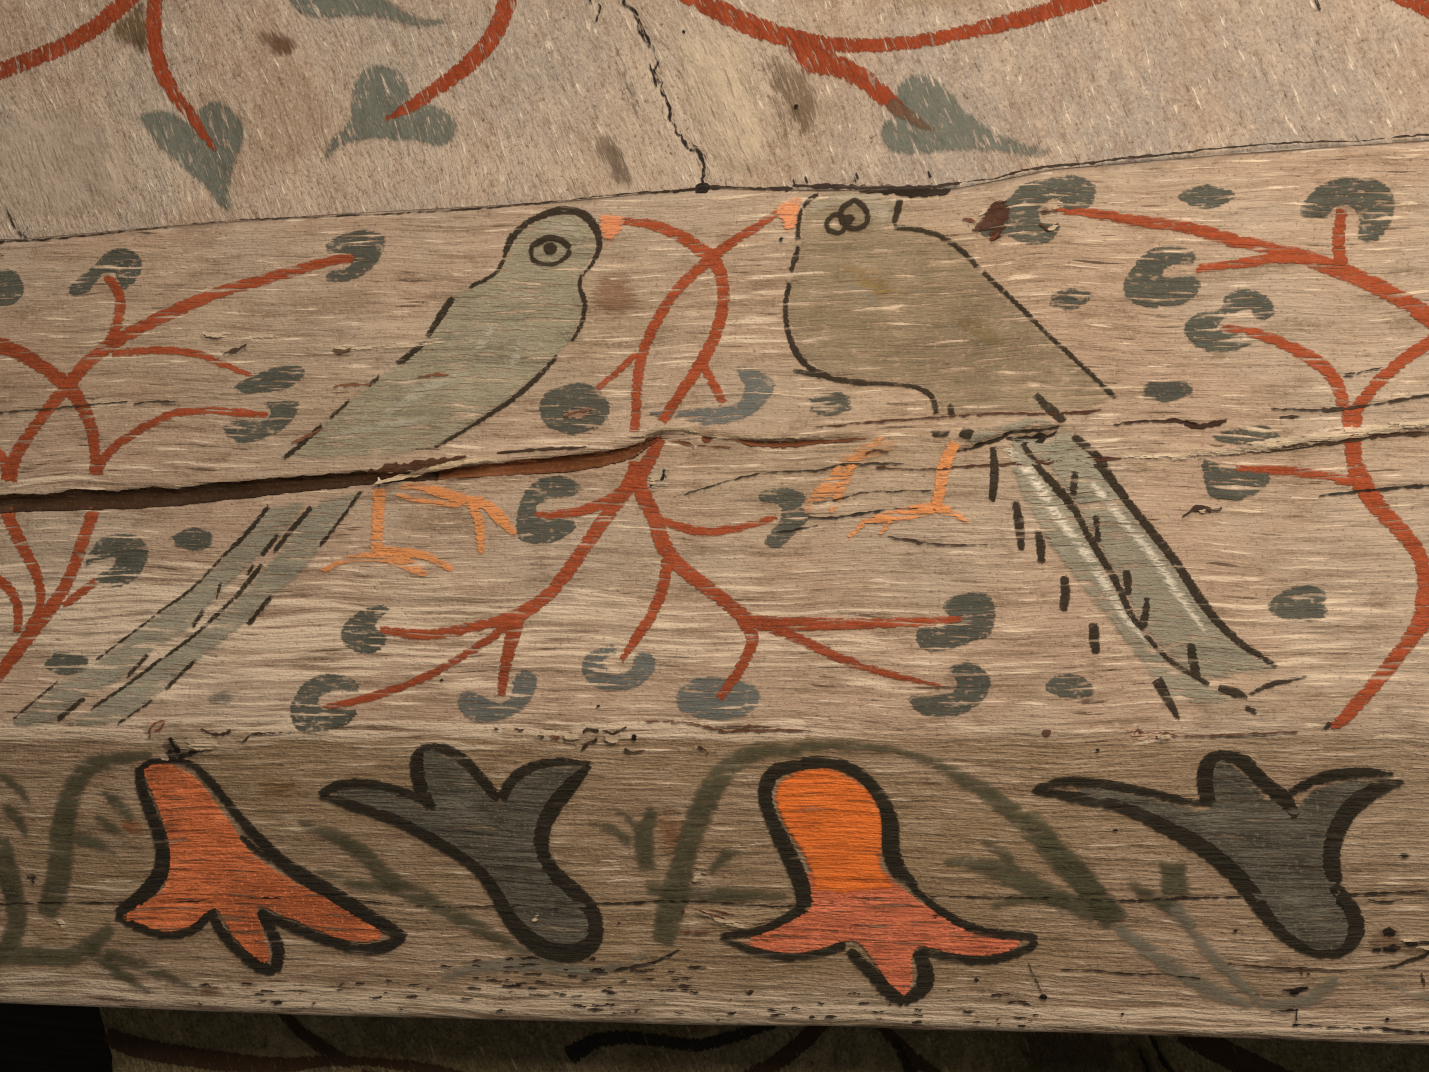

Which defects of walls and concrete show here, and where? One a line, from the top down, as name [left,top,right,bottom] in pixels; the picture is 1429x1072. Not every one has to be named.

crack [590,0,706,183]
crack [419,370,449,378]
crack [333,381,372,389]
crack [0,400,176,414]
crack [817,409,1102,427]
crack [1270,394,1429,452]
crack [292,427,324,443]
crack [1319,484,1429,496]
crack [674,455,1152,546]